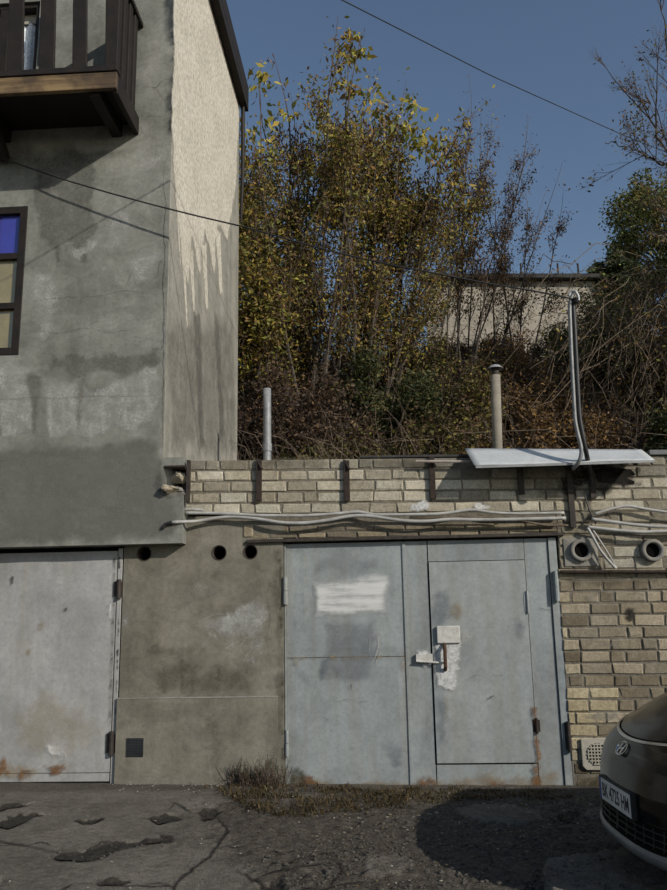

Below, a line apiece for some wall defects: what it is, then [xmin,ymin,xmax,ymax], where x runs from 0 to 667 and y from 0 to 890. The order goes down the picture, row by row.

damp [0,355,159,436]